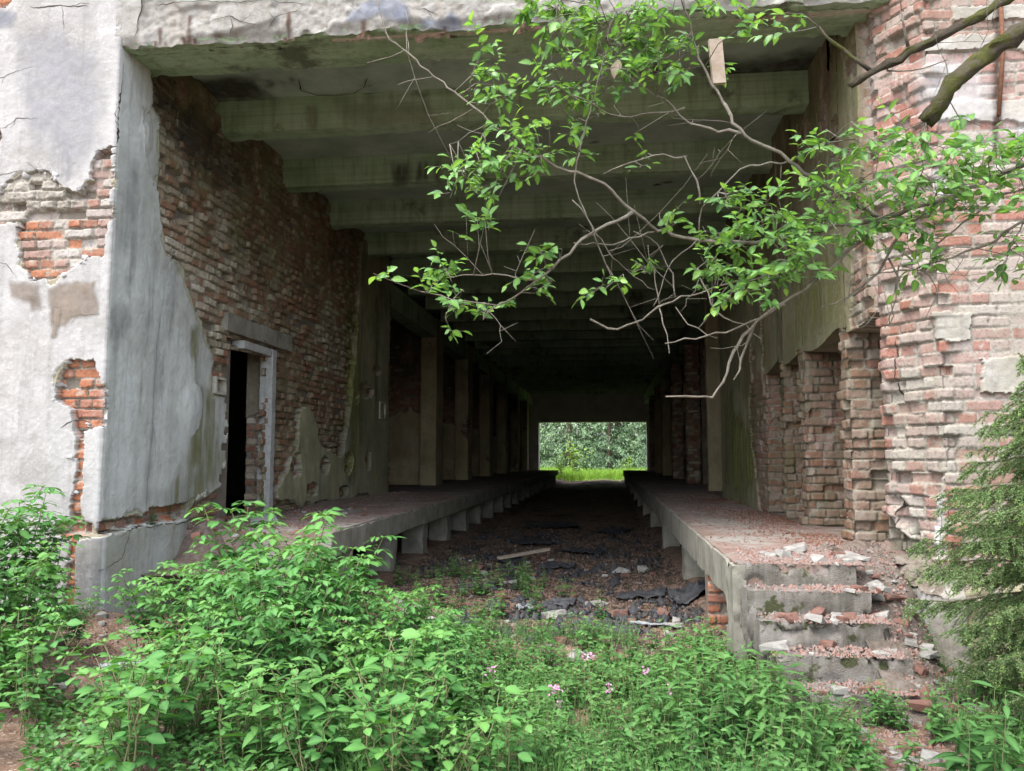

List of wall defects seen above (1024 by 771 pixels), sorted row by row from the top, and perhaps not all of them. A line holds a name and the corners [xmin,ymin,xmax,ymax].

damp [12,282,97,337]
spalling [0,145,116,282]
spalling [52,75,392,605]
spalling [858,0,1024,570]